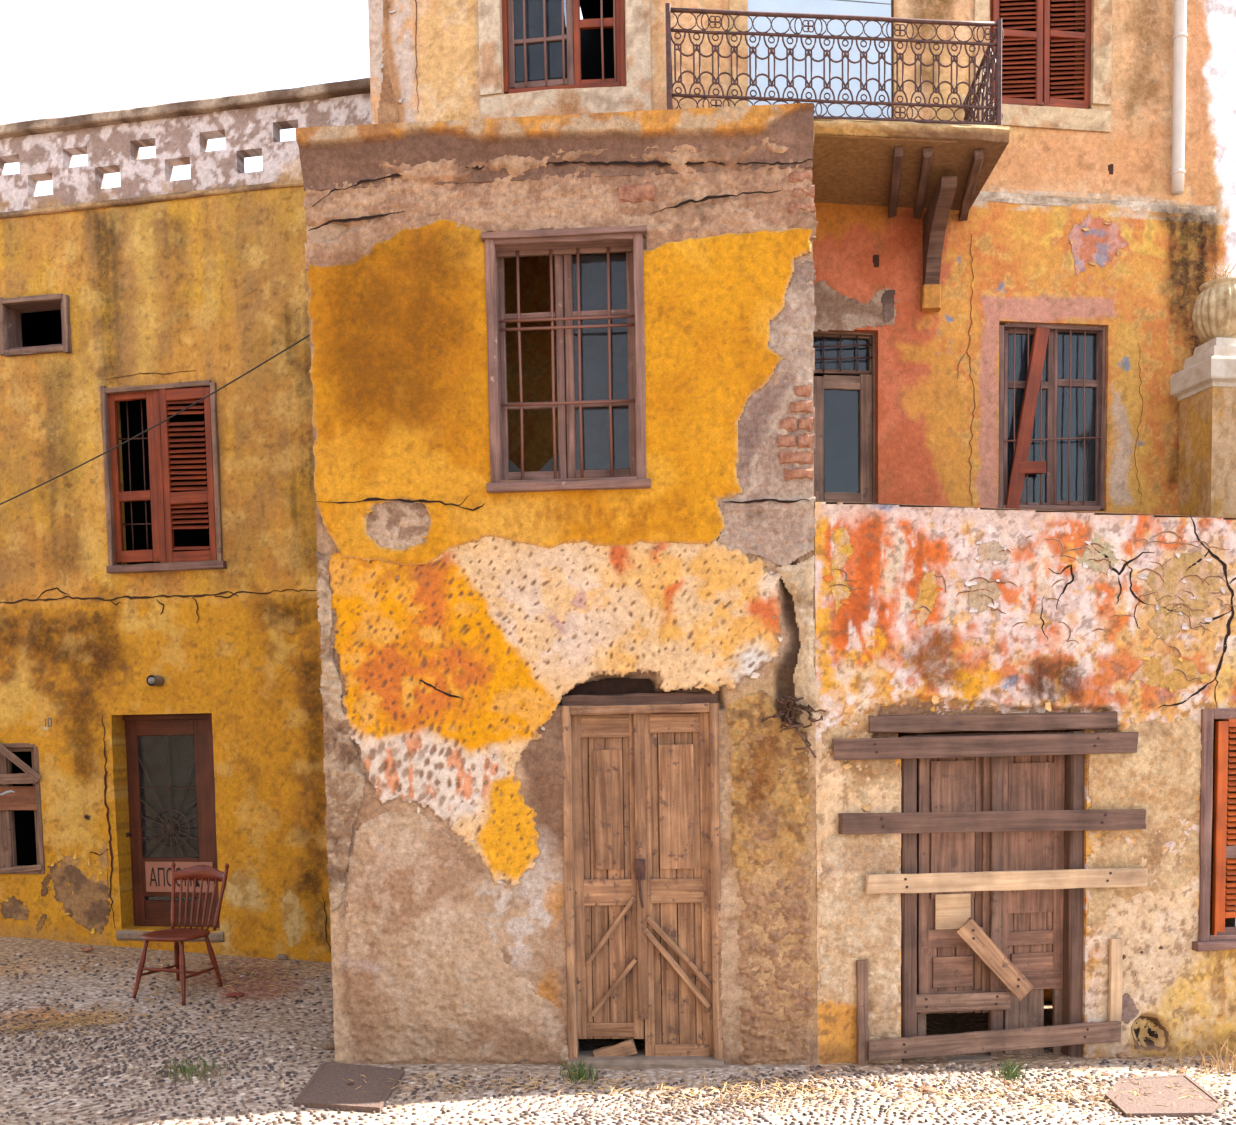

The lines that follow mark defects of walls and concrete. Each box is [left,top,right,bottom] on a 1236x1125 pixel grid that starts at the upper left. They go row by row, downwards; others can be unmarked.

spalling [303,137,818,271]
peeling [1068,214,1129,275]
damp [1163,210,1213,356]
crack [1134,343,1143,503]
crack [0,587,316,624]
spalling [316,260,898,912]
peeling [911,540,1028,628]
peeling [1046,532,1119,578]
crack [1040,514,1236,709]
peeling [1092,530,1234,692]
spalling [0,896,47,932]
spalling [41,841,111,935]